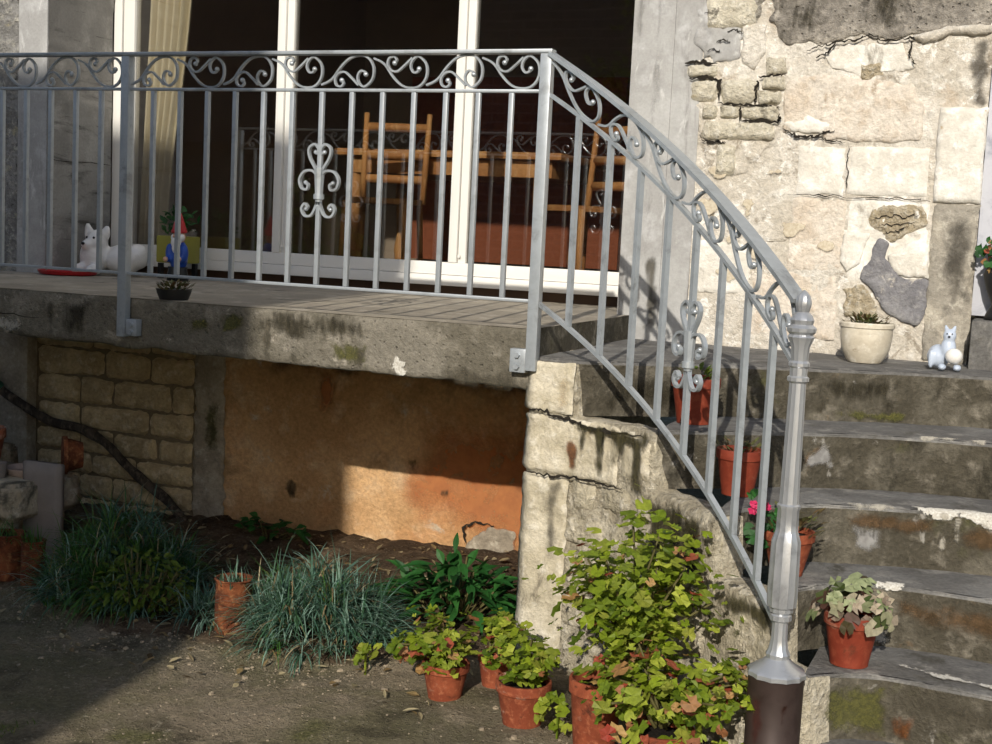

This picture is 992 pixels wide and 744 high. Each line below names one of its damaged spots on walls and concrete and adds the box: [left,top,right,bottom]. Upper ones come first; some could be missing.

crack [807,33,916,64]
peeling [685,0,992,179]
peeling [701,198,718,215]
water stain [263,315,361,347]
crack [530,408,643,437]
rust [410,437,526,538]
crack [525,470,622,490]